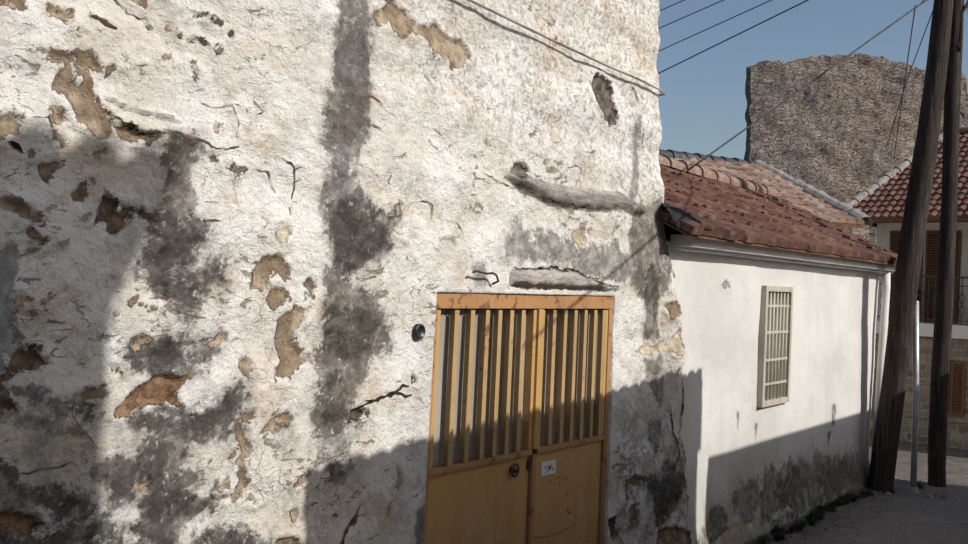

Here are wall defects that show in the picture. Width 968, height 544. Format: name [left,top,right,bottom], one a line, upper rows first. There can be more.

flaking render [29,148,66,188]
flaking render [37,2,162,159]
water stain [134,128,227,325]
flaking render [250,206,318,383]
water stain [308,0,402,484]
flaking render [372,0,470,71]
water stain [506,198,672,341]
flaking render [591,72,619,127]
water stain [0,378,251,544]
water stain [191,523,279,544]
crack [341,503,364,544]
crack [351,384,412,411]